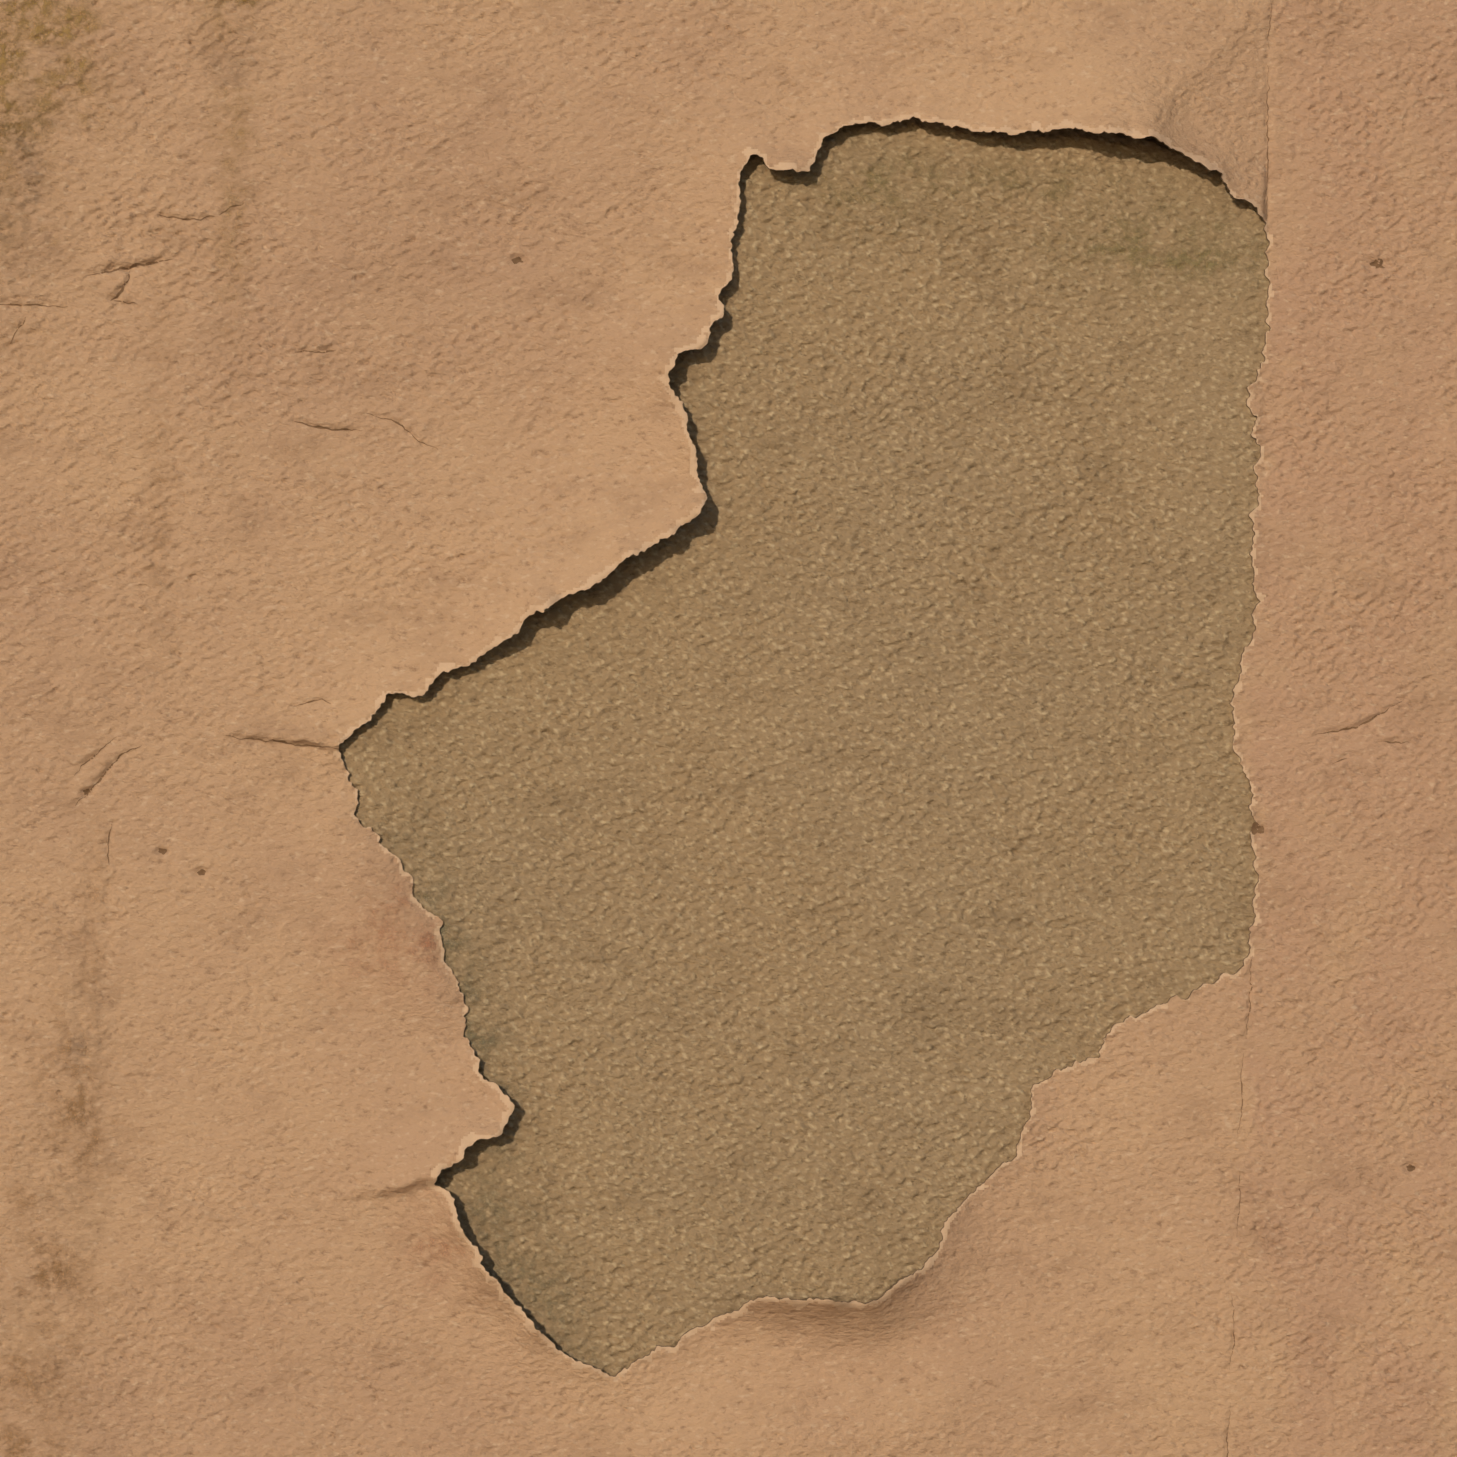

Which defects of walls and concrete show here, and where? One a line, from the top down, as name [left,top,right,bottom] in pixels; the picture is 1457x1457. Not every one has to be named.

peeling [185,19,1270,1439]